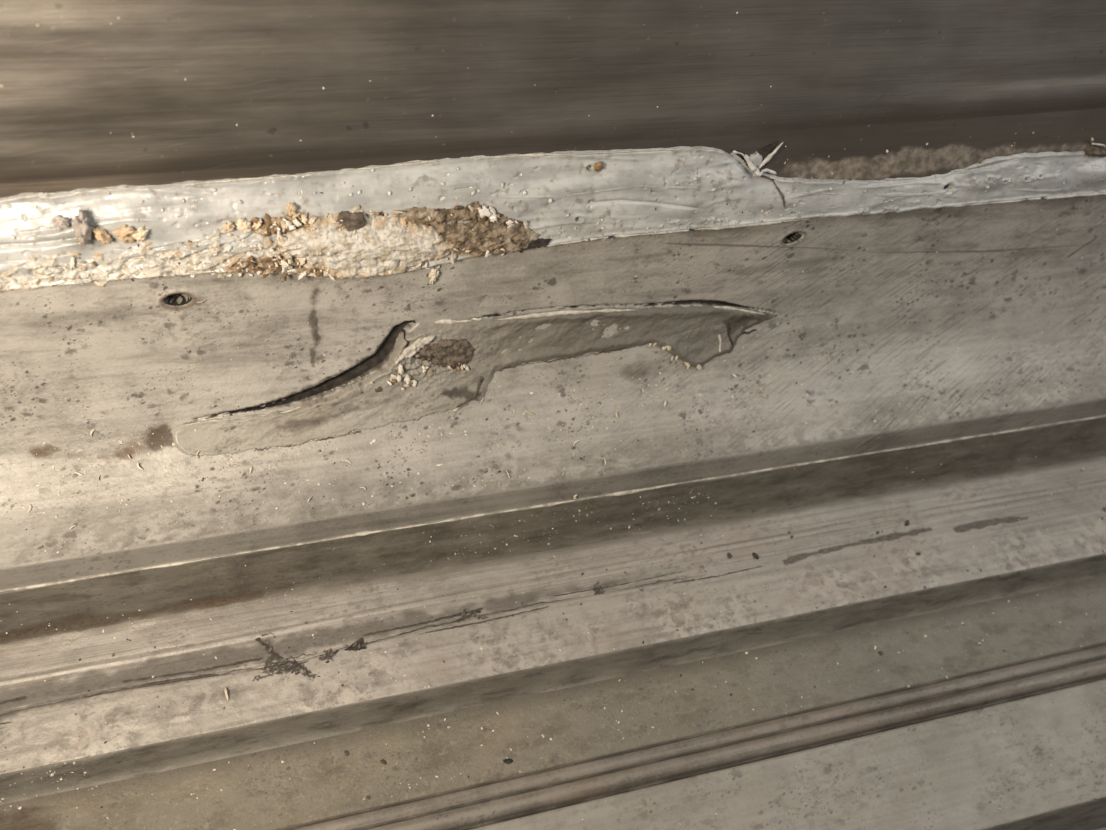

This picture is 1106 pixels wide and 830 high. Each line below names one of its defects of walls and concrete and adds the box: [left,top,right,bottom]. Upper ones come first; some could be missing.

spalling [0,211,347,291]
spalling [330,201,541,273]
peeling [171,304,775,456]